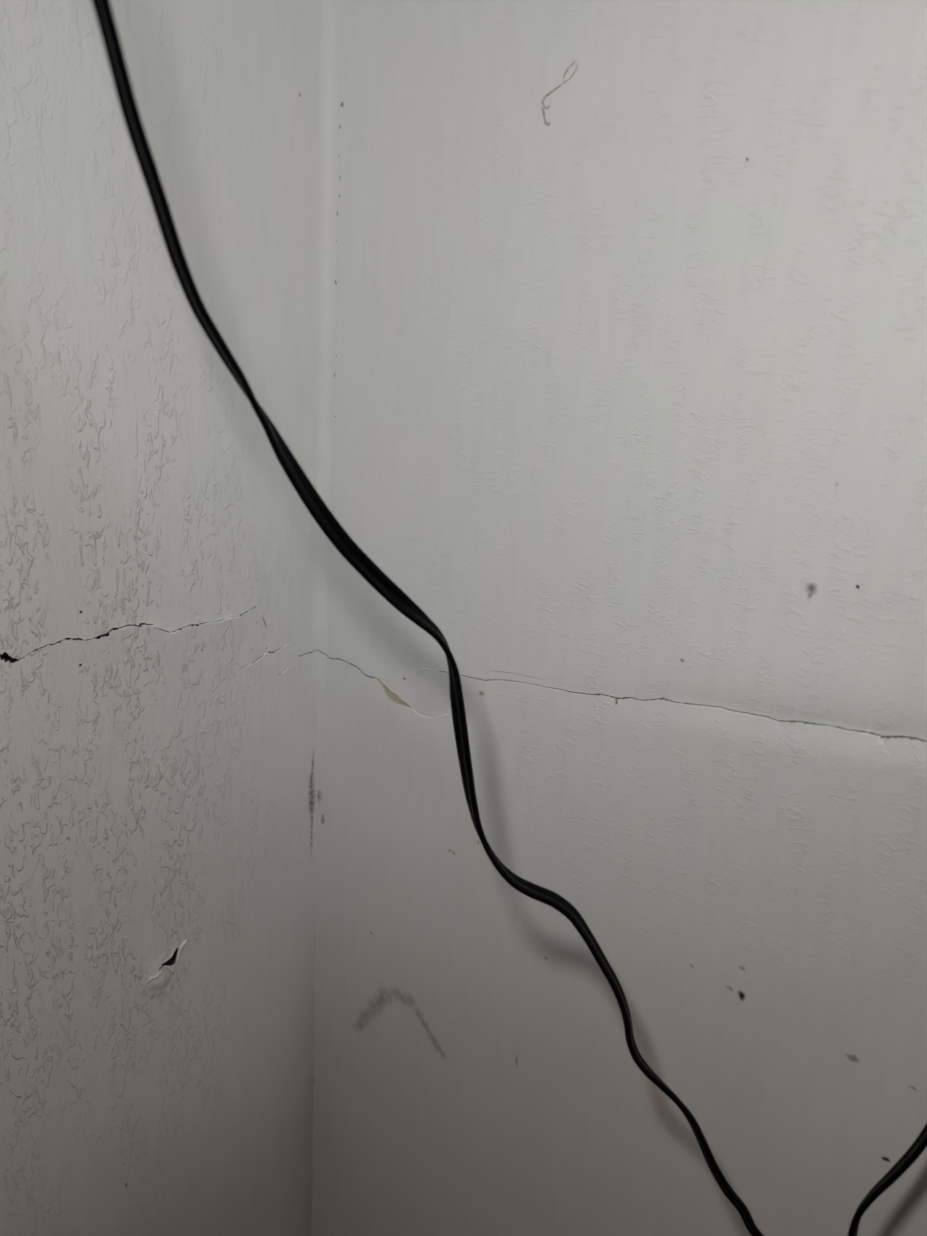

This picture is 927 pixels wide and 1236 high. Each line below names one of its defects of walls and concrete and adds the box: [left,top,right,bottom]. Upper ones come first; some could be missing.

crack [0,606,376,679]
crack [439,670,927,746]